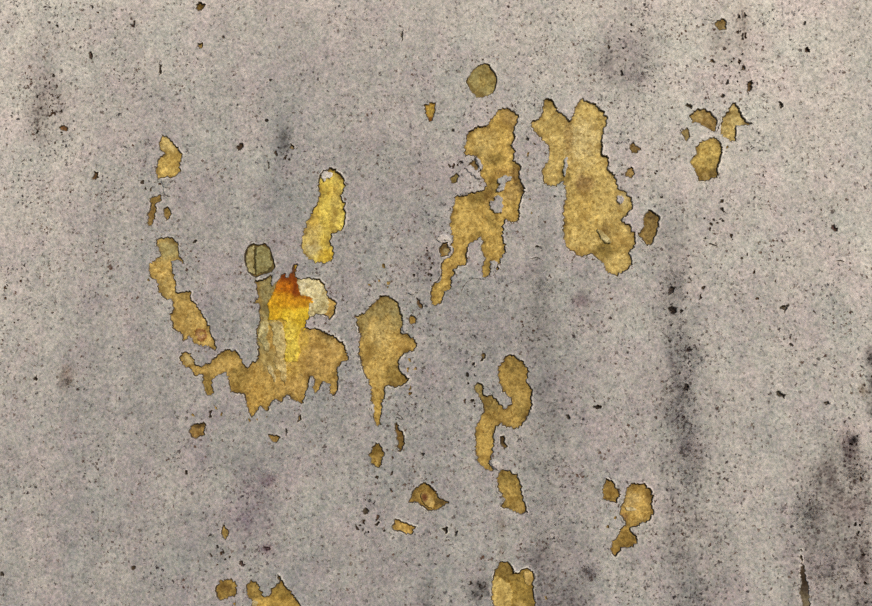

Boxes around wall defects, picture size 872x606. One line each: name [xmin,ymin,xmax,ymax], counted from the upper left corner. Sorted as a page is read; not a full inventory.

peeling [464,62,499,98]
peeling [140,134,184,227]
peeling [147,97,663,479]
peeling [463,352,535,517]
peeling [407,480,450,513]
peeling [600,476,656,559]
leakage [777,420,872,605]
peeling [208,524,303,606]
peeling [469,559,547,606]
crack [798,547,812,606]